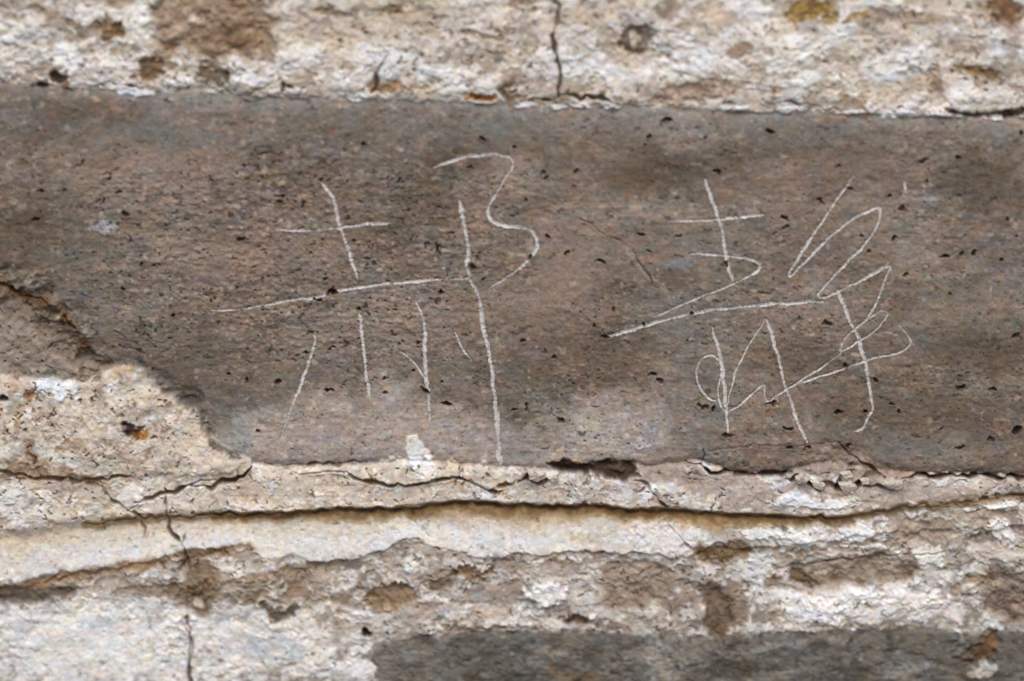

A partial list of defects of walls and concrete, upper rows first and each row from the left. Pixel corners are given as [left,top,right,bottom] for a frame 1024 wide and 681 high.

crack [527,0,623,108]
spalling [0,260,247,462]
crack [0,440,1024,574]
spalling [528,435,708,494]
crack [180,599,196,681]